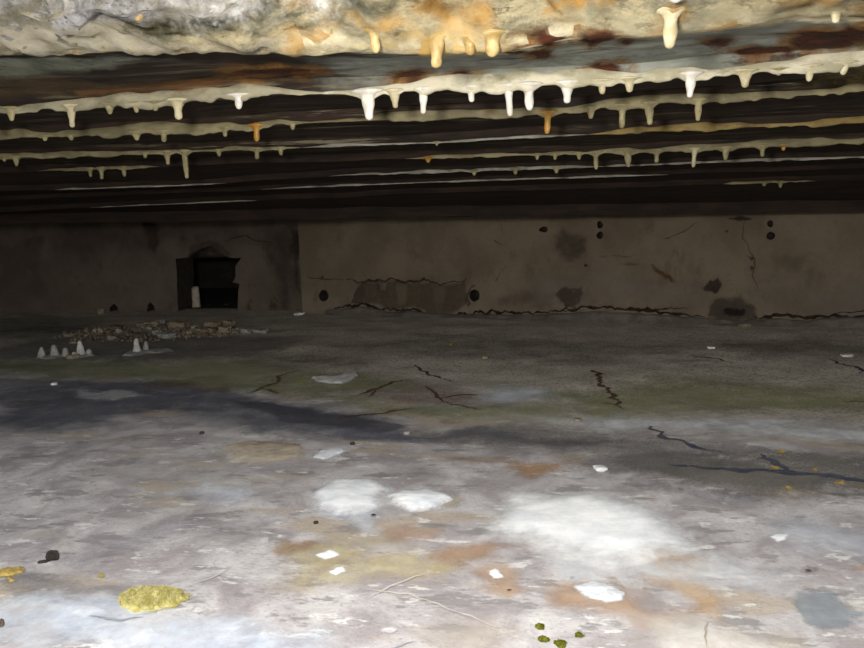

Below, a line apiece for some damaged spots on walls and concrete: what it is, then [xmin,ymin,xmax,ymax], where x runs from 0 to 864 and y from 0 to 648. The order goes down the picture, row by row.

rust [390,69,433,84]
damp [0,48,864,114]
rust [510,23,631,59]
rust [588,60,624,72]
rust [702,20,864,63]
damp [0,83,864,140]
damp [0,116,864,190]
crack [457,305,703,317]
crack [754,310,864,320]
crack [340,365,481,418]
crack [647,426,864,482]
damp [315,479,461,529]